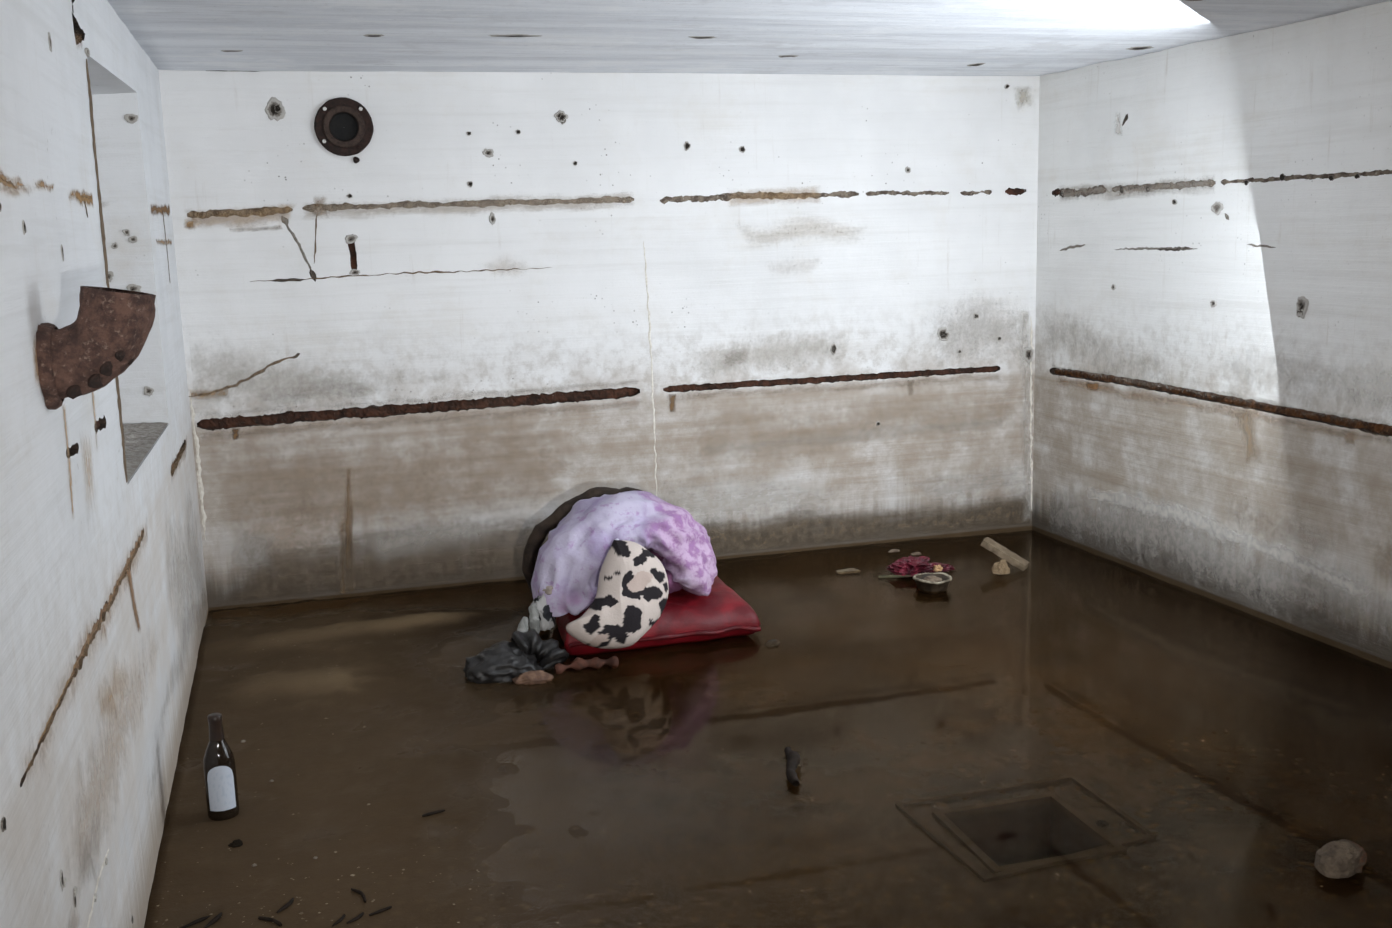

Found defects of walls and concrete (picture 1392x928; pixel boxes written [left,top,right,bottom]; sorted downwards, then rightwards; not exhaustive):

rust [0,172,53,191]
rust [69,190,93,217]
water stain [937,327,961,354]
water stain [1023,347,1034,363]
water stain [683,492,1027,550]
water stain [251,528,549,597]
rust [126,566,140,630]